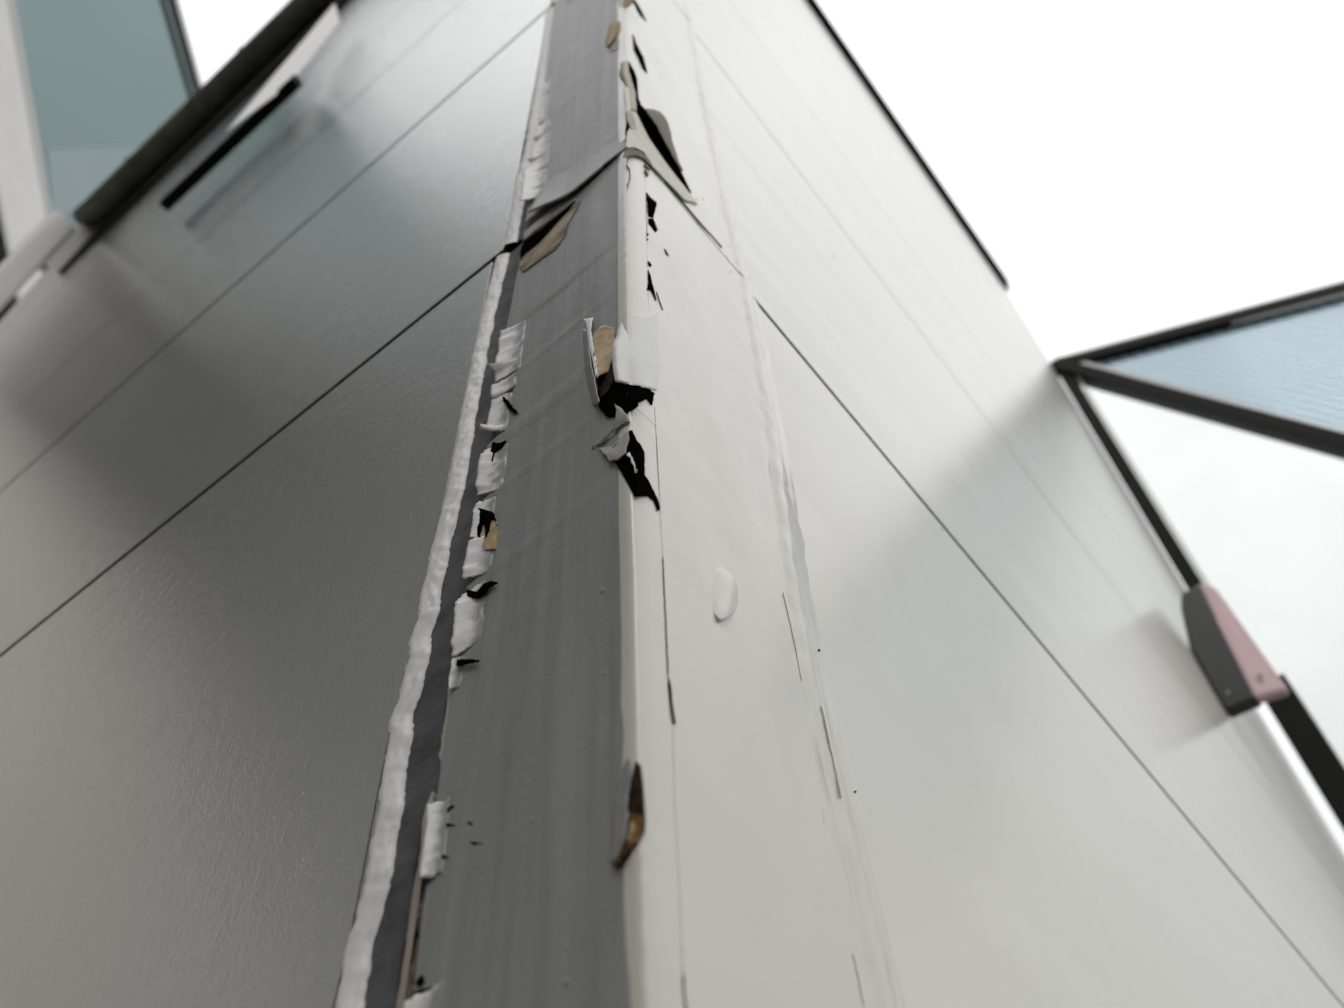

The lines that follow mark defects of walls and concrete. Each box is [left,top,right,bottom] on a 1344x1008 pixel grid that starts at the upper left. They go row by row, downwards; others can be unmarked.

peeling [519,0,698,273]
peeling [448,320,527,691]
peeling [582,261,663,511]
peeling [419,796,451,880]
peeling [610,757,645,869]
peeling [403,980,444,1008]